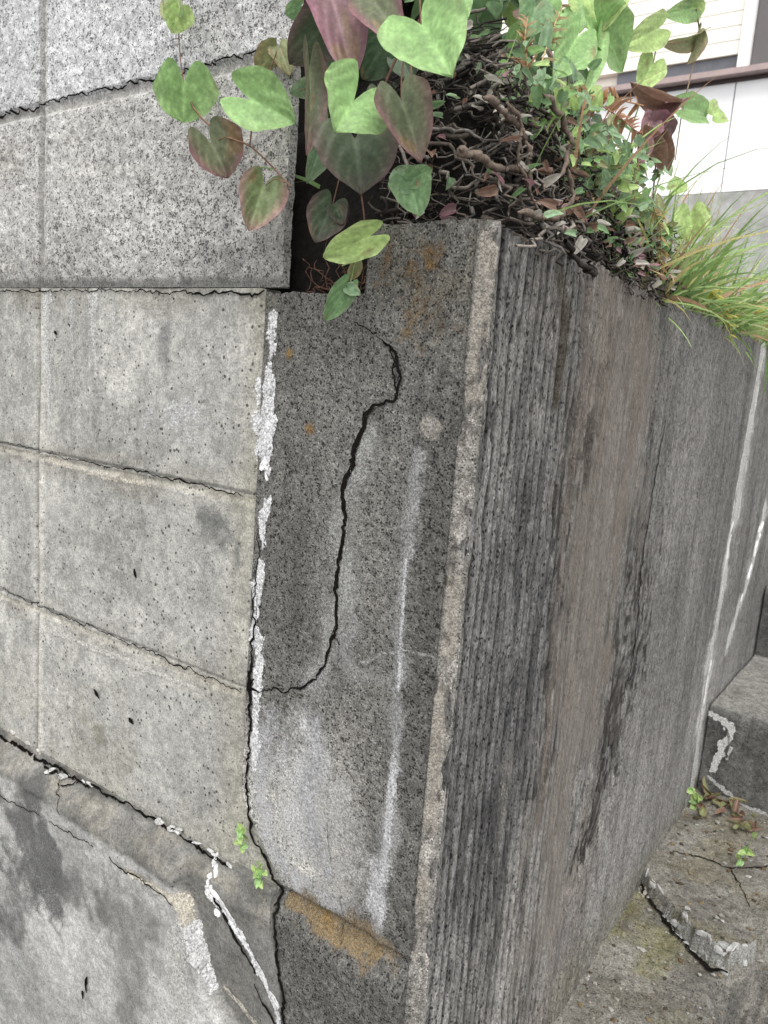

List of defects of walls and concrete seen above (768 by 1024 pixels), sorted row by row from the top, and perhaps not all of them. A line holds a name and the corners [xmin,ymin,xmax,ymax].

crack [0,79,155,119]
crack [181,50,256,75]
water stain [532,273,645,833]
crack [0,322,402,1024]
water stain [253,425,425,932]
rust [286,892,401,975]
spalling [638,868,757,975]
crack [676,851,768,907]